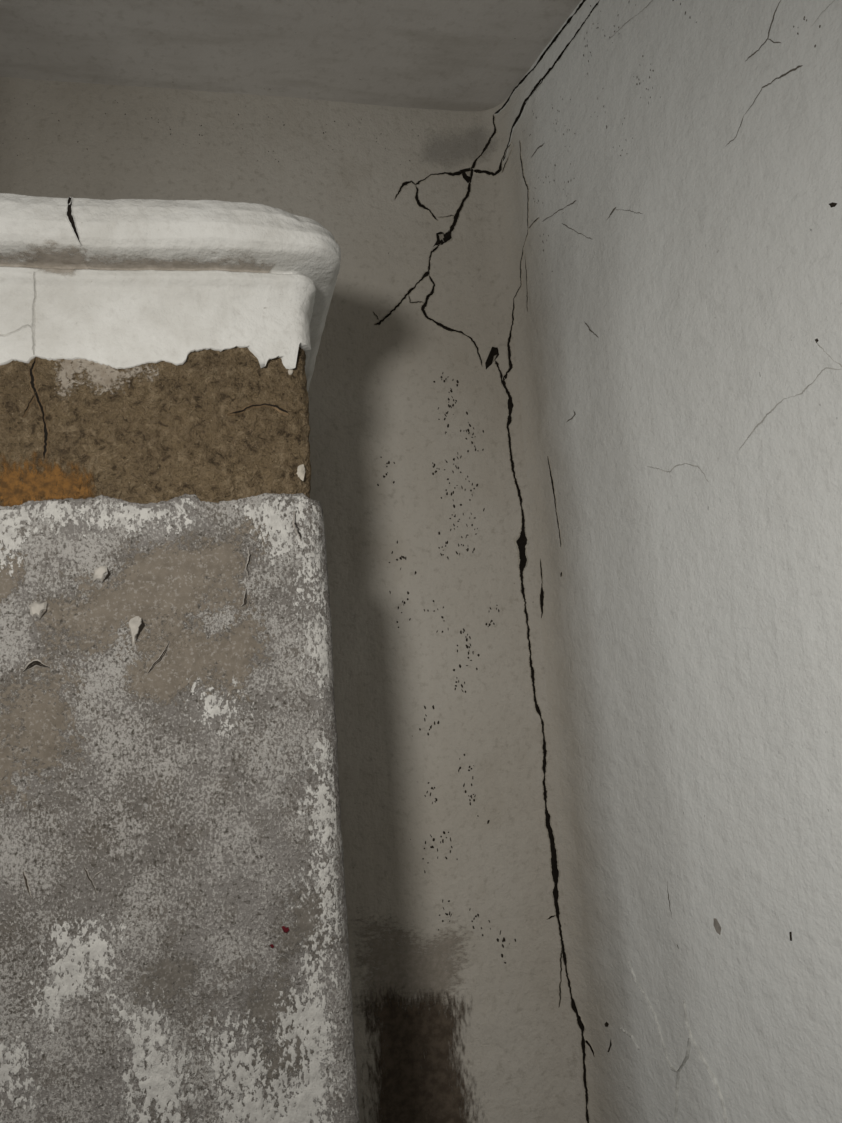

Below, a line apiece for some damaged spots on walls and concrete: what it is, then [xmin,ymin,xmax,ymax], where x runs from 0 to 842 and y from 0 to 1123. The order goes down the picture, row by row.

crack [748,0,781,58]
crack [728,65,803,144]
crack [65,197,82,247]
rust [0,452,96,507]
flaking render [432,373,485,559]
crack [740,343,842,448]
crack [373,0,600,1123]
flaking render [0,347,353,1123]
leakage [355,919,476,1123]
crack [620,961,728,1123]